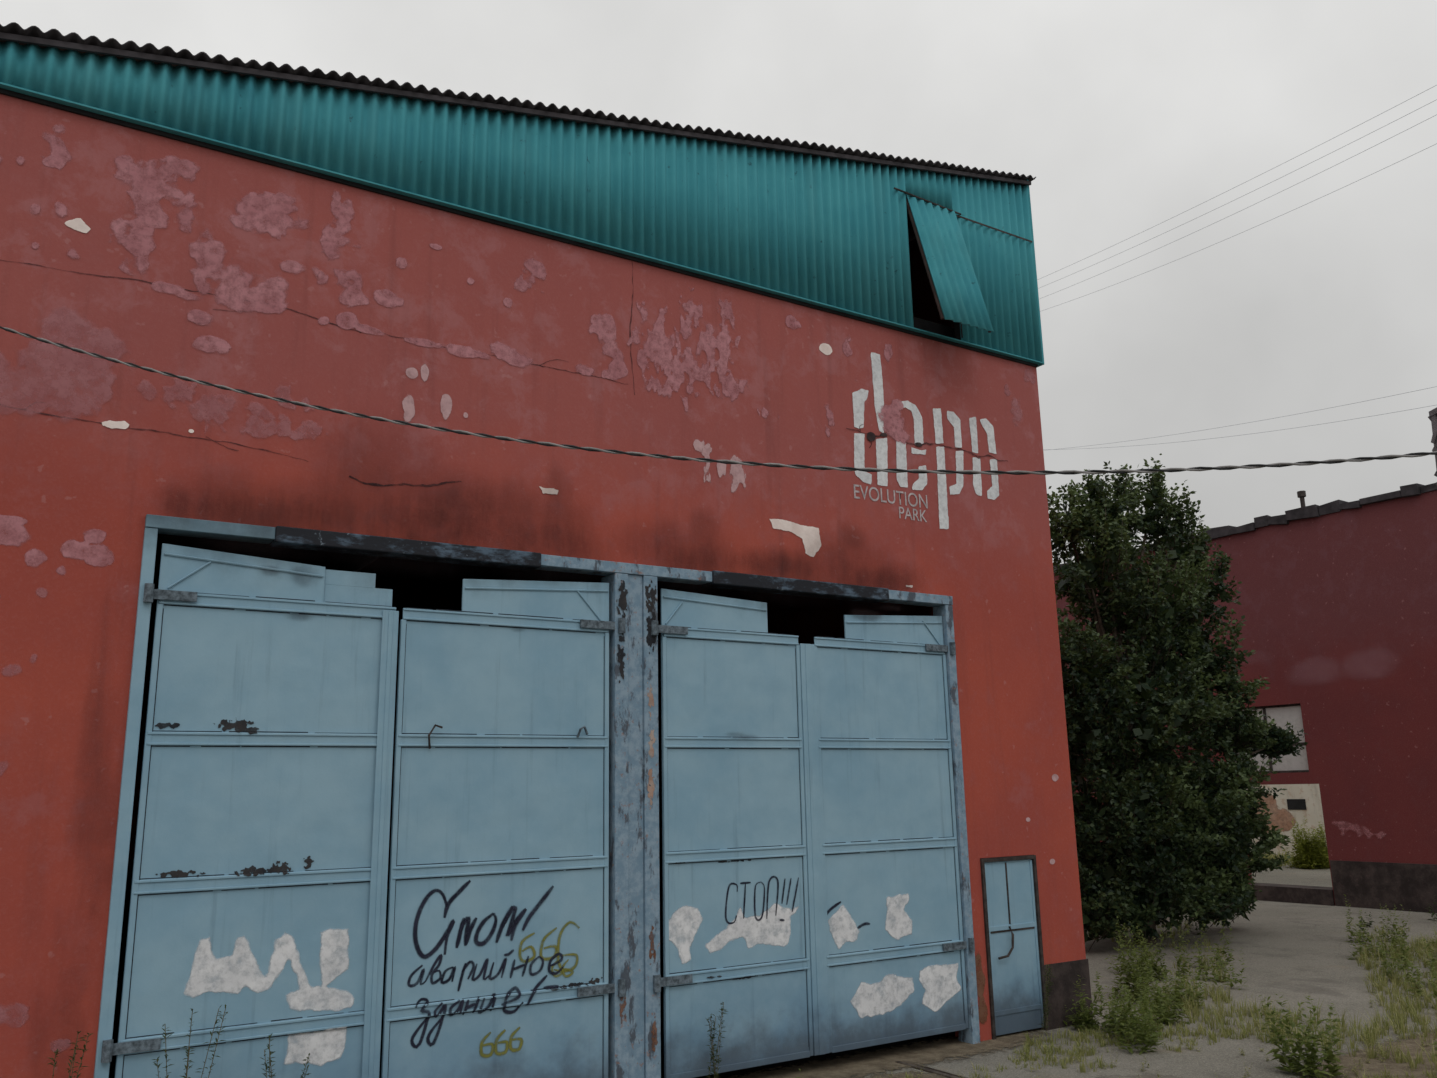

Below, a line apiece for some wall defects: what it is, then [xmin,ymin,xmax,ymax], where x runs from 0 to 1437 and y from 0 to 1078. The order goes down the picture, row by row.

spalling [31,202,90,233]
peeling [111,155,404,353]
crack [2,260,248,312]
crack [530,263,635,395]
peeling [576,288,748,411]
crack [0,402,299,459]
peeling [0,515,114,575]